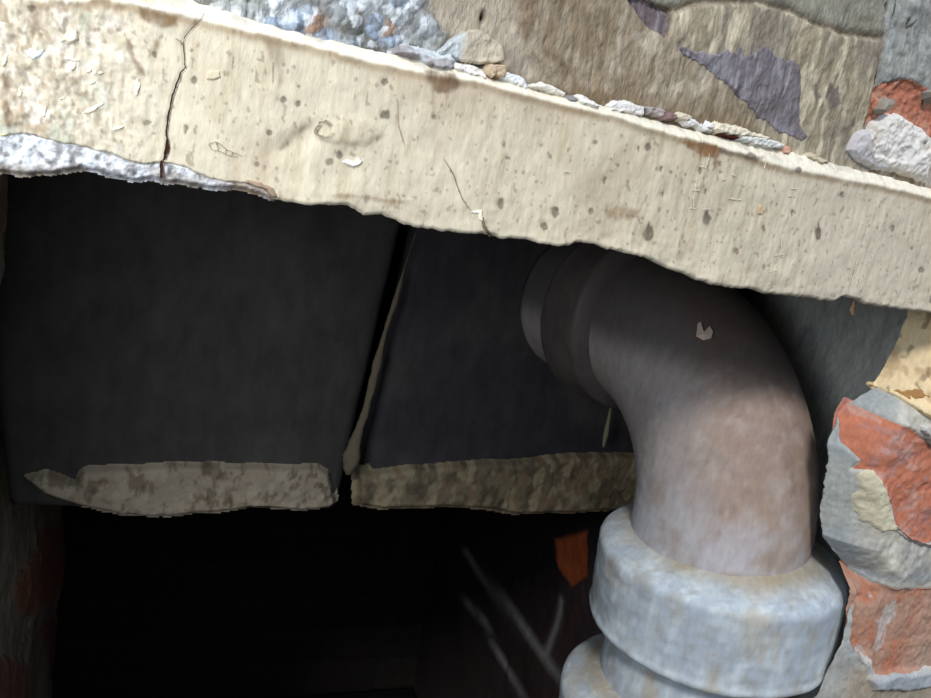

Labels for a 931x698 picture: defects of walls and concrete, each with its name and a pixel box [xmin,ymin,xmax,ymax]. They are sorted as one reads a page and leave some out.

crack [160,12,205,178]
spalling [454,62,791,168]
flaking render [865,79,931,138]
spalling [0,133,277,201]
crack [444,159,490,237]
peeling [691,154,738,224]
spalling [803,152,829,163]
flaking render [832,310,931,547]
flaking render [839,560,931,675]